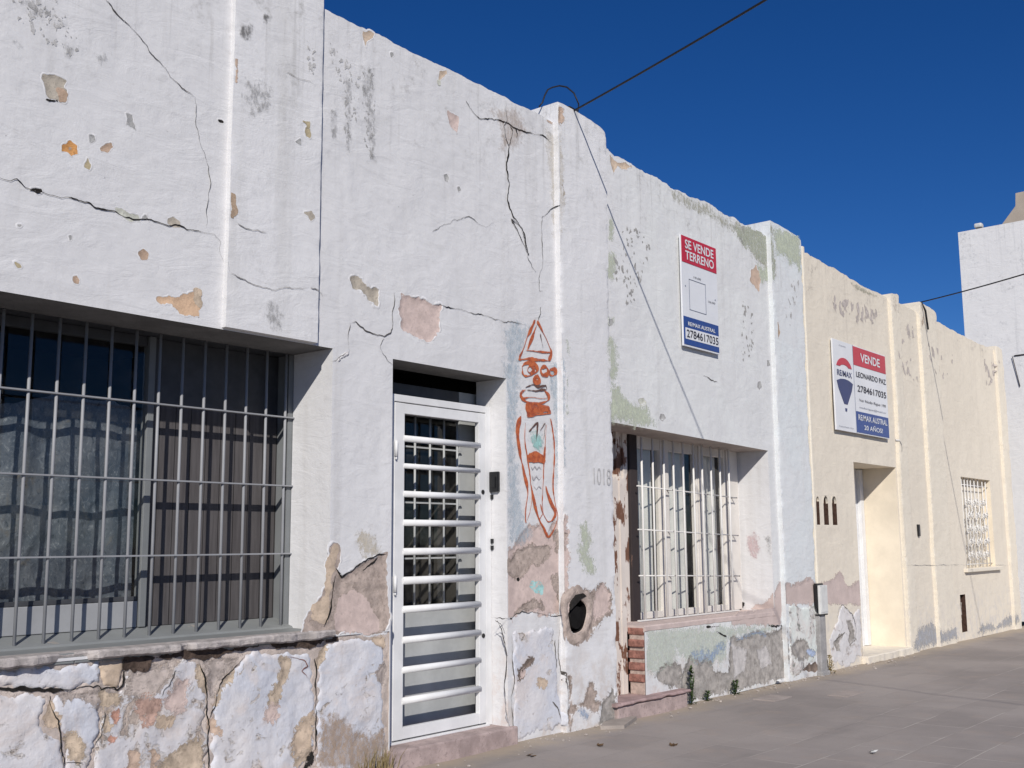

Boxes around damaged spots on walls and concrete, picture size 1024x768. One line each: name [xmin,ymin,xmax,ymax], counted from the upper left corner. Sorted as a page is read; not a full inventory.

peeling [40,72,69,105]
crack [106,0,190,93]
crack [1,120,323,296]
crack [445,101,560,325]
peeling [155,287,203,318]
crack [331,296,395,364]
flaking render [348,274,381,310]
flaking render [397,292,444,344]
flaking render [507,514,614,646]
flaking render [42,540,393,768]
flaking render [655,571,861,702]